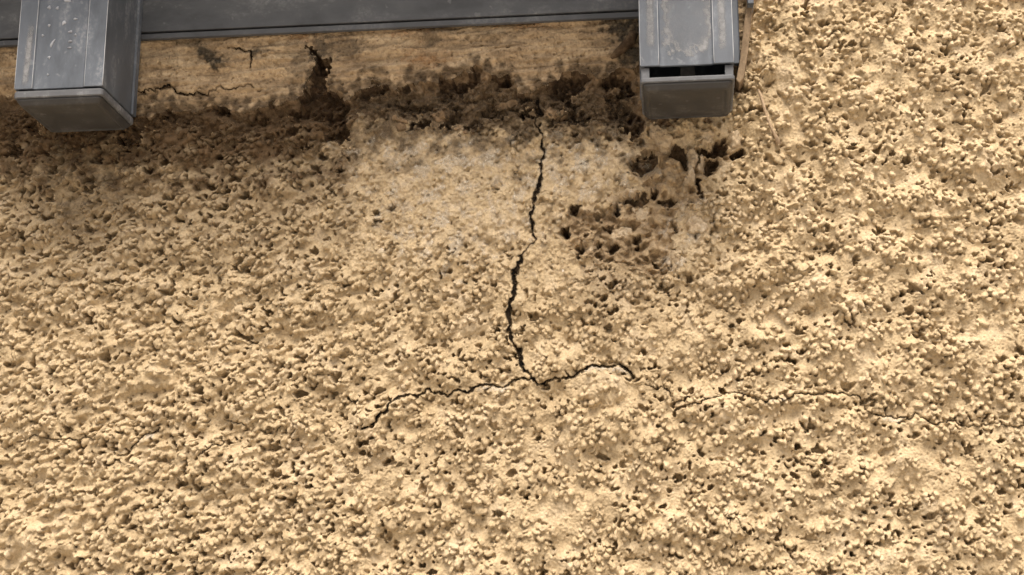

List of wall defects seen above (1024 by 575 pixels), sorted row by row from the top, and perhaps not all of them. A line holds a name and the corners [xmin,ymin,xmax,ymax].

crack [138,47,254,96]
leakage [0,0,725,200]
crack [361,98,1022,429]